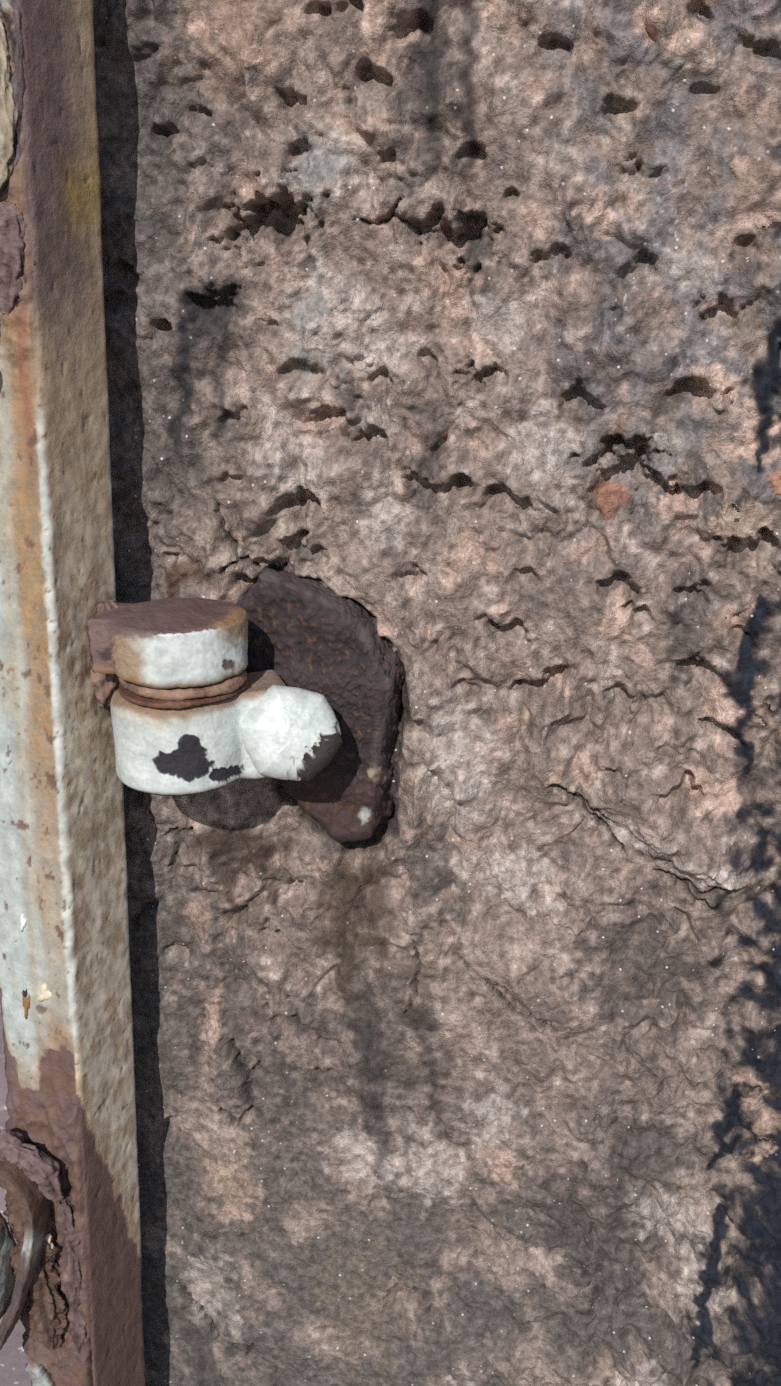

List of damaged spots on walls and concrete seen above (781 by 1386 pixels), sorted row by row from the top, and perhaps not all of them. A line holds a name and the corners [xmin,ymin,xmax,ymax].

rust [0,0,36,315]
crack [565,788,624,848]
crack [222,1051,254,1113]
rust [3,1191,90,1354]